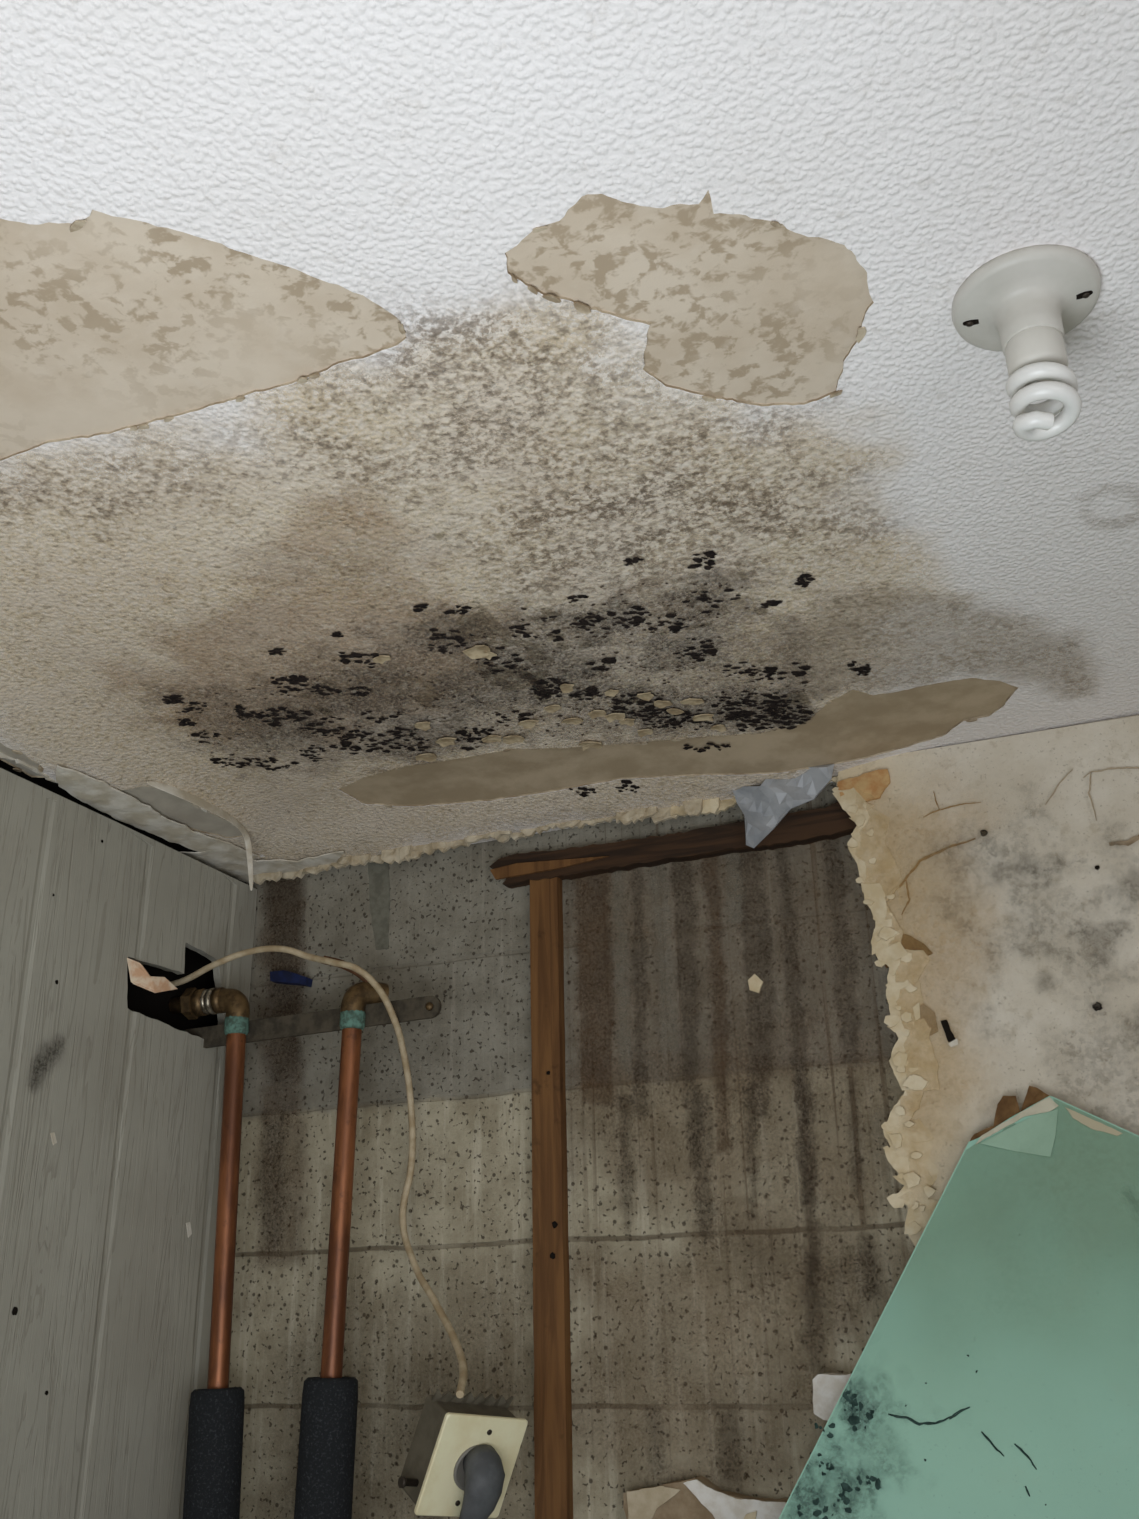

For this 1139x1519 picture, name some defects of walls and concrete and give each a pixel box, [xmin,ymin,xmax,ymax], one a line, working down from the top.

peeling [0,210,406,459]
peeling [506,190,873,404]
leakage [0,315,1088,860]
peeling [0,743,737,891]
peeling [341,678,1017,1235]